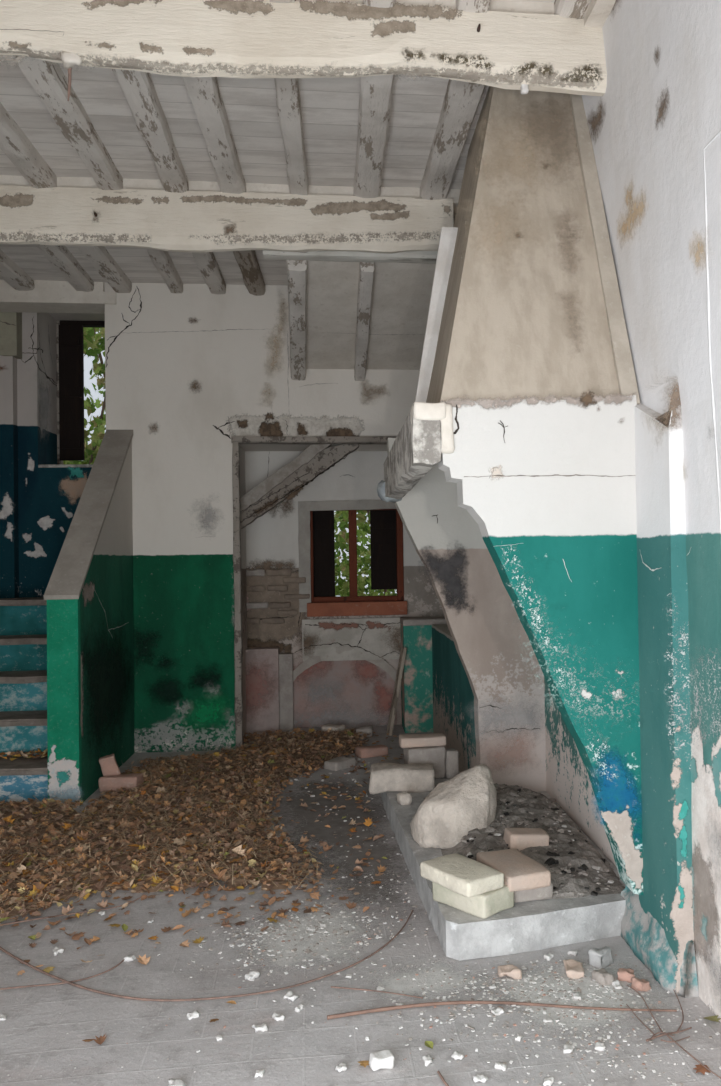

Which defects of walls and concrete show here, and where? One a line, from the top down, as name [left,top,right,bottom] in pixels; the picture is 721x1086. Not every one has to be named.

peeling [83,0,162,10]
peeling [204,0,275,15]
peeling [80,41,595,89]
peeling [0,193,33,208]
peeling [92,195,438,244]
peeling [228,413,365,437]
flaking render [445,391,632,410]
peeling [0,473,87,558]
peeling [504,546,634,718]
damp [82,627,172,750]
peeling [664,606,721,1022]
peeling [601,805,643,889]